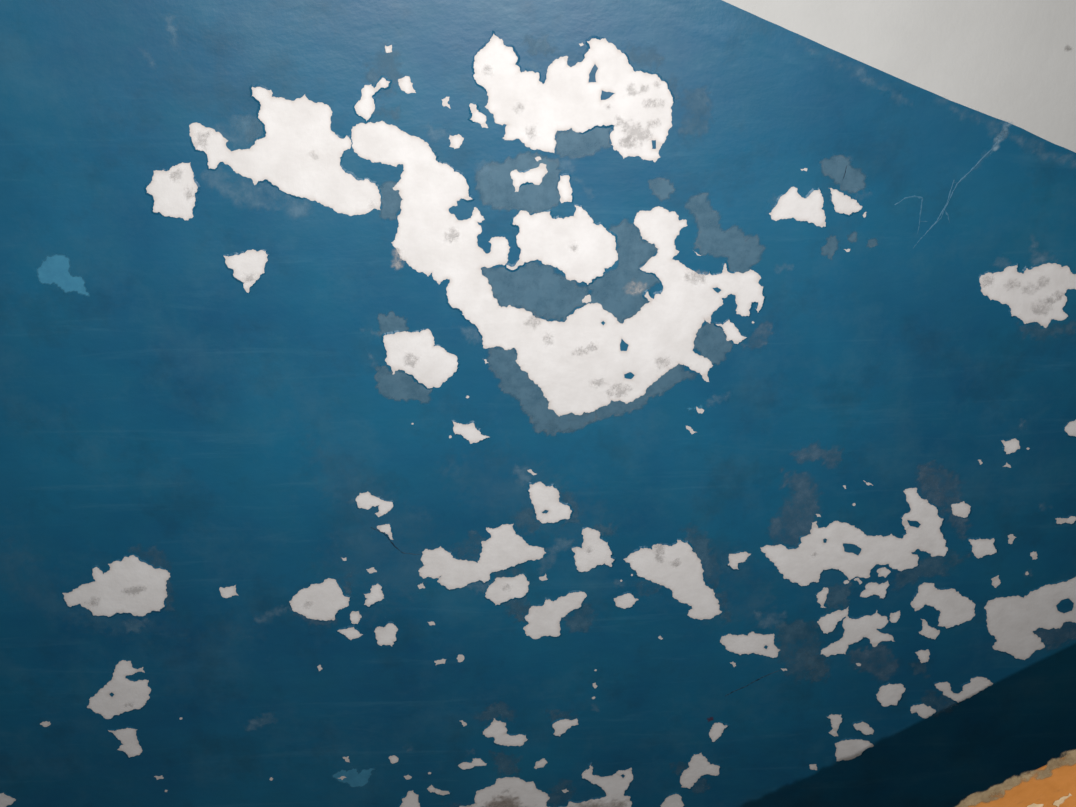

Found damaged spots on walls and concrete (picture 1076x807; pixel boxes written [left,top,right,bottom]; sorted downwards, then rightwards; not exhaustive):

peeling [144,31,767,435]
peeling [769,155,876,258]
peeling [978,258,1076,333]
peeling [449,420,491,444]
peeling [62,551,170,618]
peeling [288,567,398,646]
peeling [417,469,722,639]
peeling [719,467,1076,719]
peeling [85,659,152,758]
peeling [398,772,452,807]
peeling [459,762,633,807]
peeling [661,753,722,807]